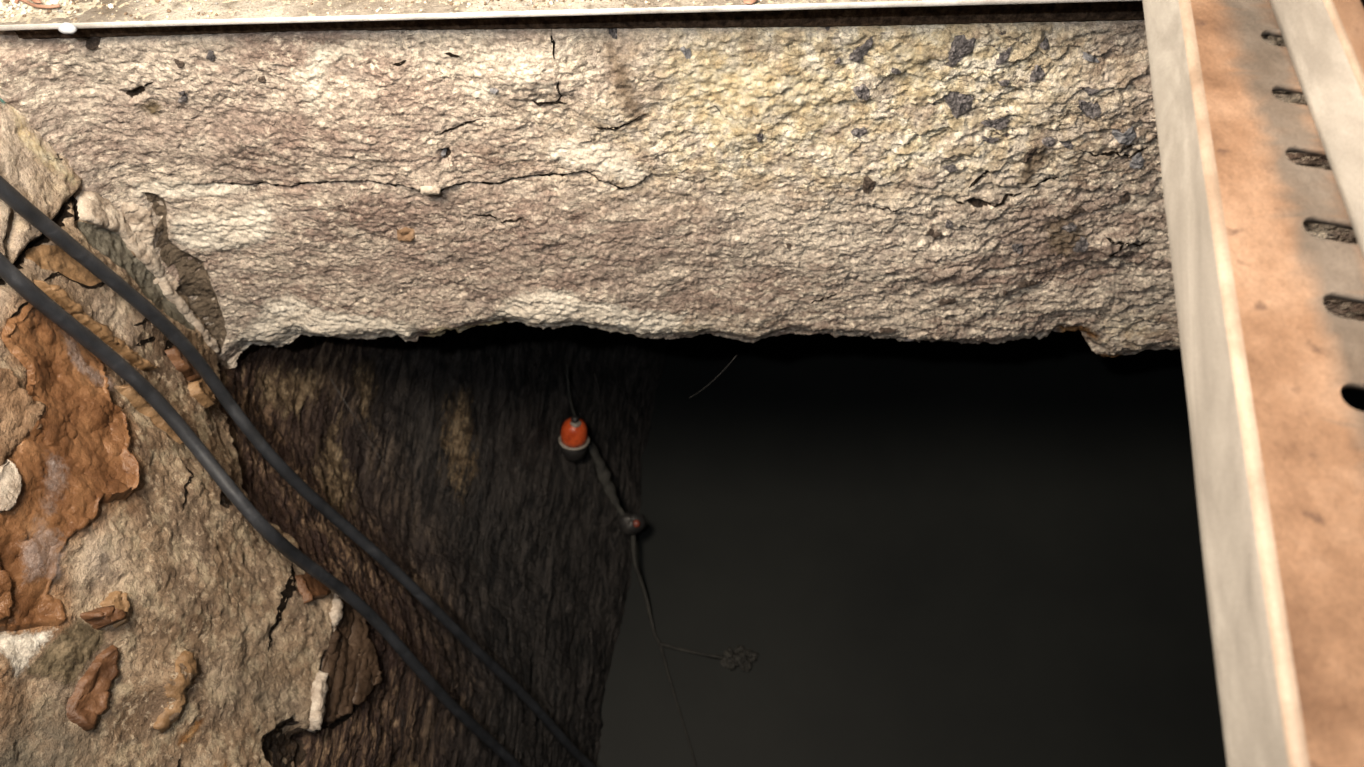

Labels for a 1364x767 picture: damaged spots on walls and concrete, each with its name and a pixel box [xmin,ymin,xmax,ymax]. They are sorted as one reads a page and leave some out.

crack [532,35,566,106]
spalling [835,36,873,64]
spalling [945,34,976,68]
crack [436,119,479,135]
crack [595,117,639,130]
spalling [944,91,1010,143]
spalling [1078,88,1102,120]
crack [190,170,652,223]
spalling [862,176,876,194]
spalling [34,190,242,409]
crack [268,564,297,652]
peeling [262,573,383,767]